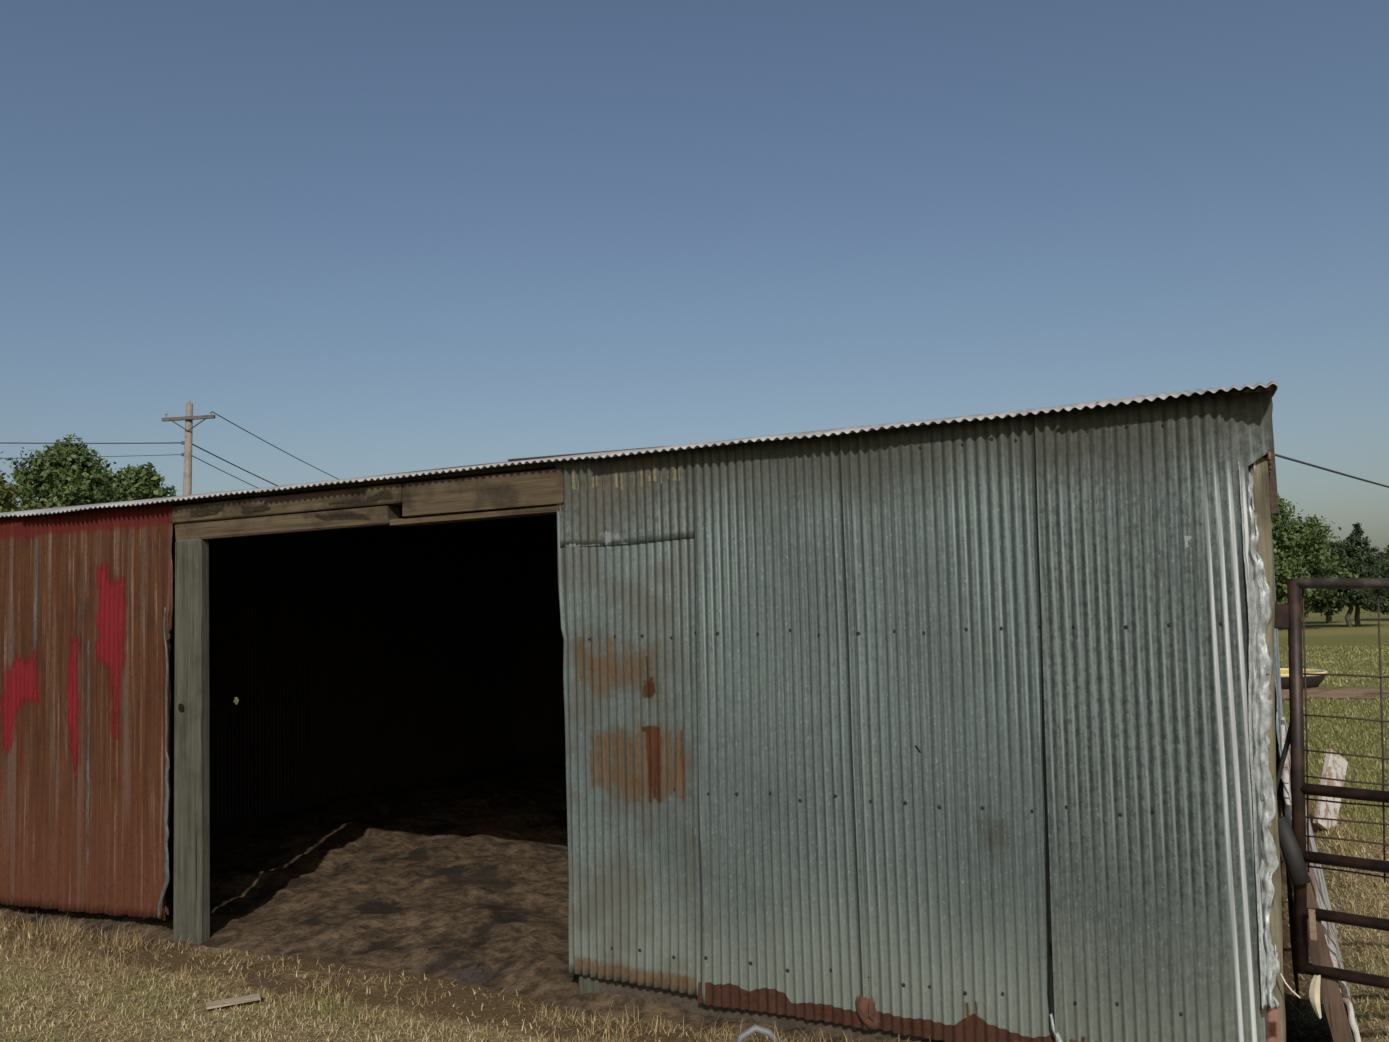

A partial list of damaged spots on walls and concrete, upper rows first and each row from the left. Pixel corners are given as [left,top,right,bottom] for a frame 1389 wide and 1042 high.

corrosion [591,726,685,802]
corrosion [576,960,1098,1042]
corrosion [1267,1008,1279,1042]